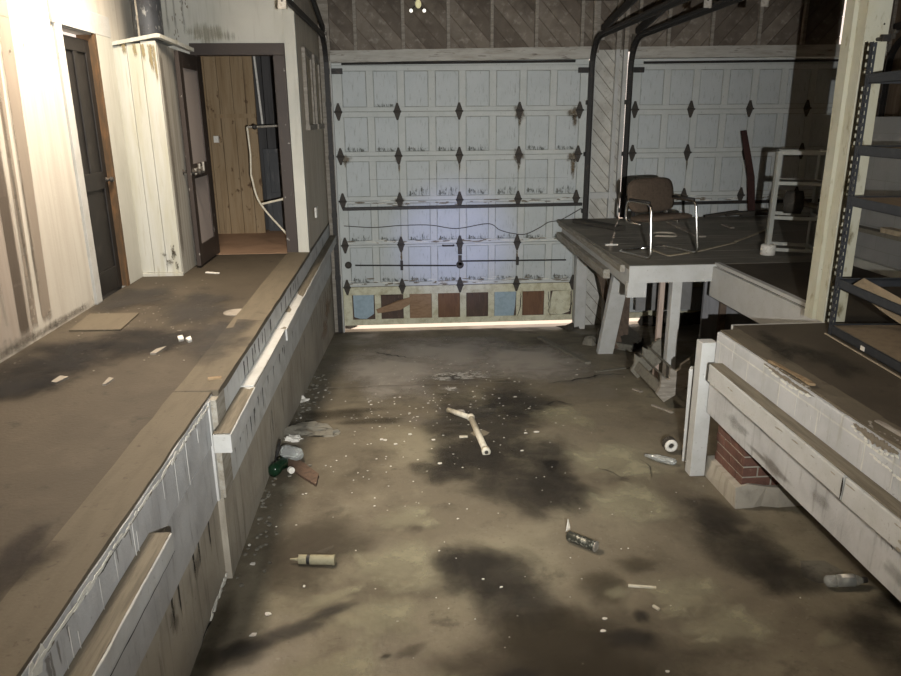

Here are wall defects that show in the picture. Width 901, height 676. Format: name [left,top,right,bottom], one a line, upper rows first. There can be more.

water stain [0,0,51,353]
peeling [28,406,209,676]
spalling [199,572,228,653]
spalling [851,420,901,481]